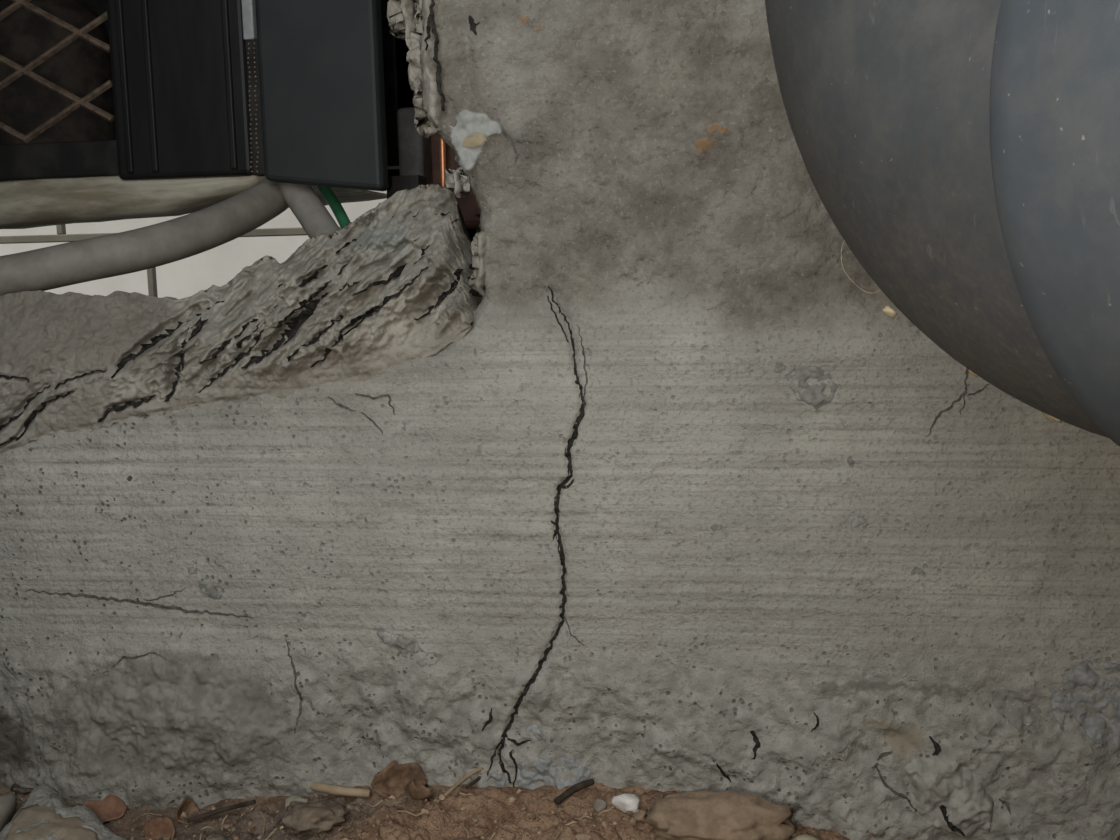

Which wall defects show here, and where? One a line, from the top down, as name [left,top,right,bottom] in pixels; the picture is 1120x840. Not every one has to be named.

spalling [0,0,501,455]
crack [482,286,588,787]